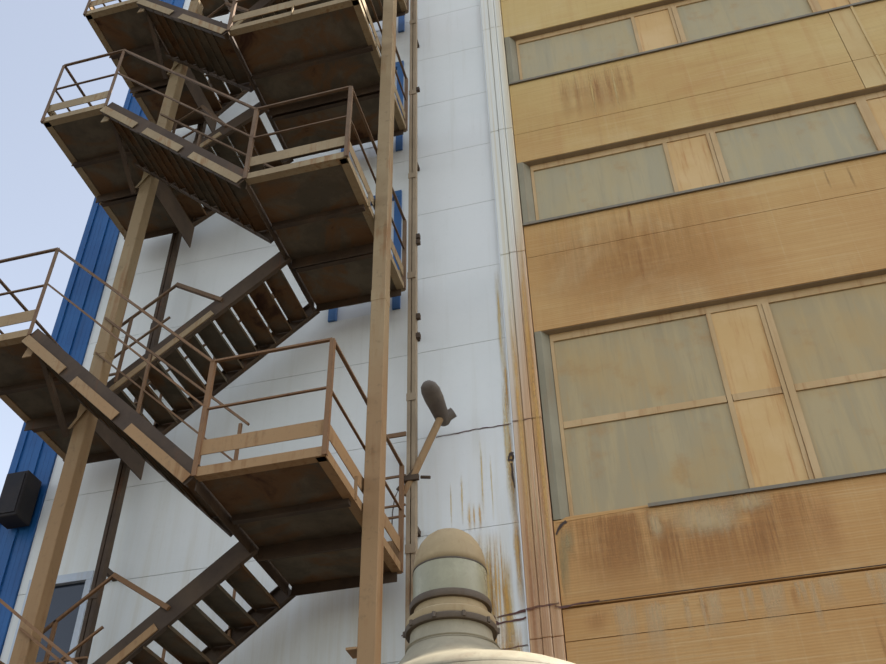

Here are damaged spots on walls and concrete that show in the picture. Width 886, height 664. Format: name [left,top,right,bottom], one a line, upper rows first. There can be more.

crack [436,416,541,438]
corrosion [486,548,519,651]